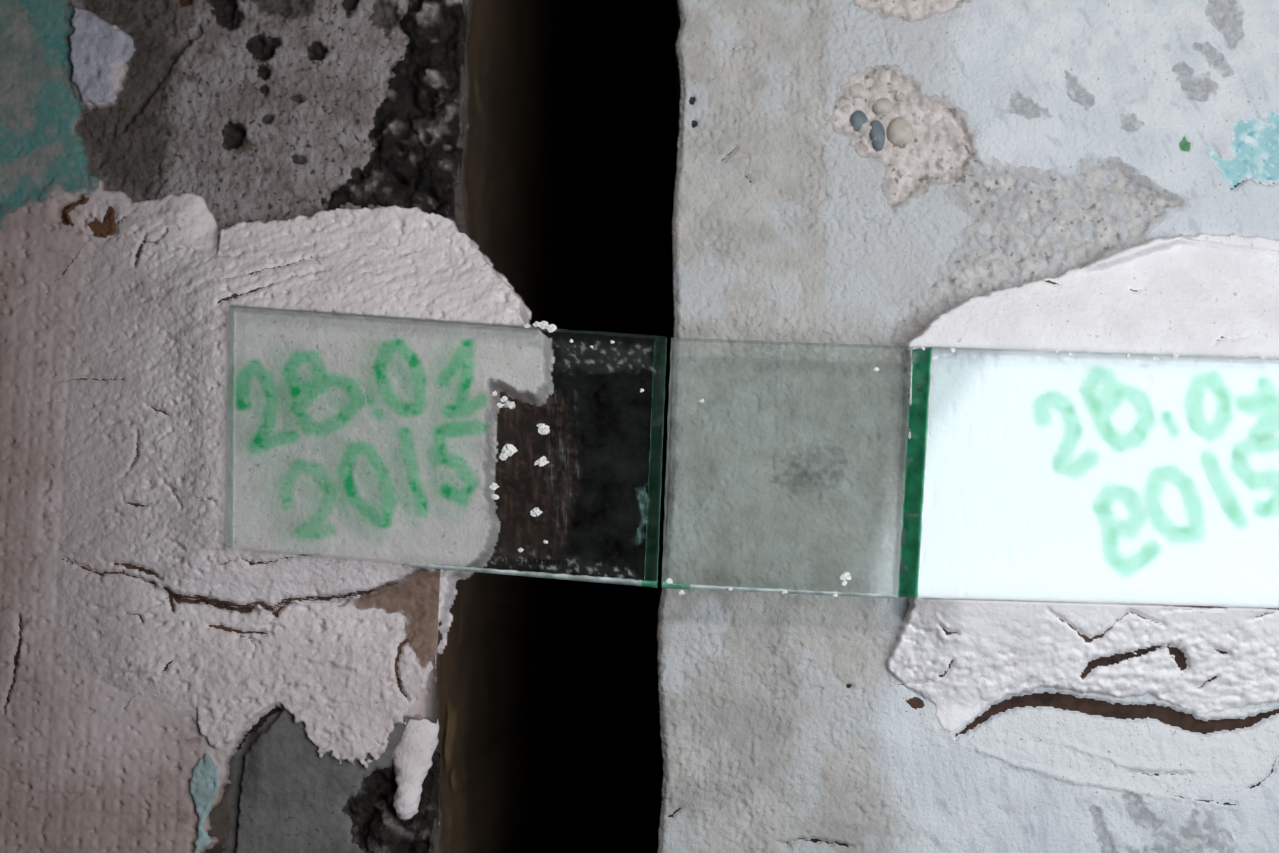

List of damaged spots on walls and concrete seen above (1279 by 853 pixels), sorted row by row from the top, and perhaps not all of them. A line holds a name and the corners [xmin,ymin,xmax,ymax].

spalling [0,0,468,232]
peeling [1179,111,1279,189]
spalling [825,64,1184,339]
crack [63,559,404,644]
crack [214,554,316,567]
crack [890,628,957,686]
crack [1056,605,1279,688]
spalling [190,705,440,853]